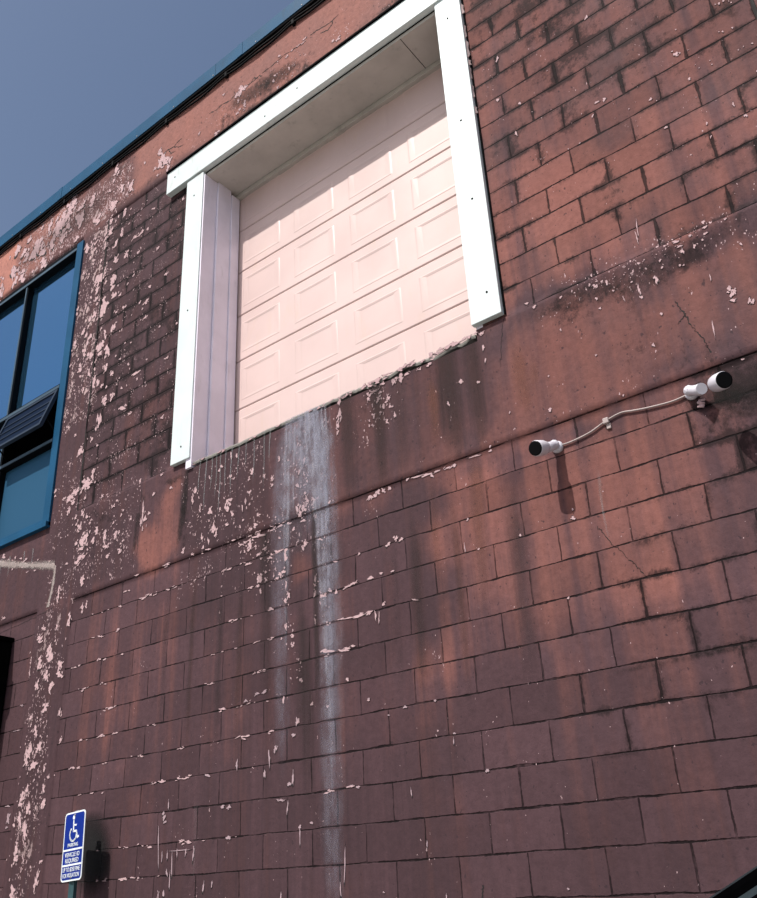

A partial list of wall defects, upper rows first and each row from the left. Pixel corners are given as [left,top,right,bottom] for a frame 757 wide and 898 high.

crack [209,16,337,114]
peeling [0,162,155,461]
peeling [589,225,709,310]
crack [675,301,712,353]
spalling [181,330,487,611]
peeling [54,467,156,587]
peeling [313,570,395,626]
peeling [4,600,88,898]
peeling [119,799,205,898]